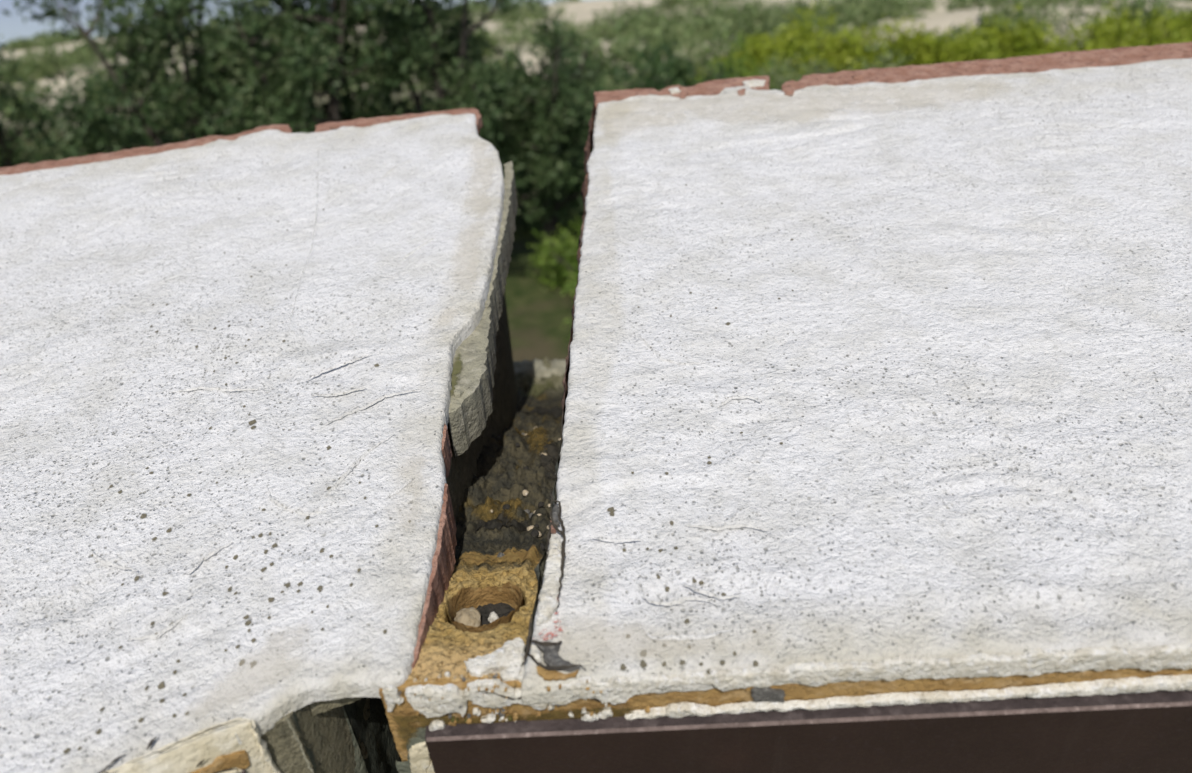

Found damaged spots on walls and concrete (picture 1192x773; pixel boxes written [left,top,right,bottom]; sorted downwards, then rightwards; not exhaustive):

peeling [382,161,1192,773]
spalling [308,697,362,716]
spalling [191,717,313,773]